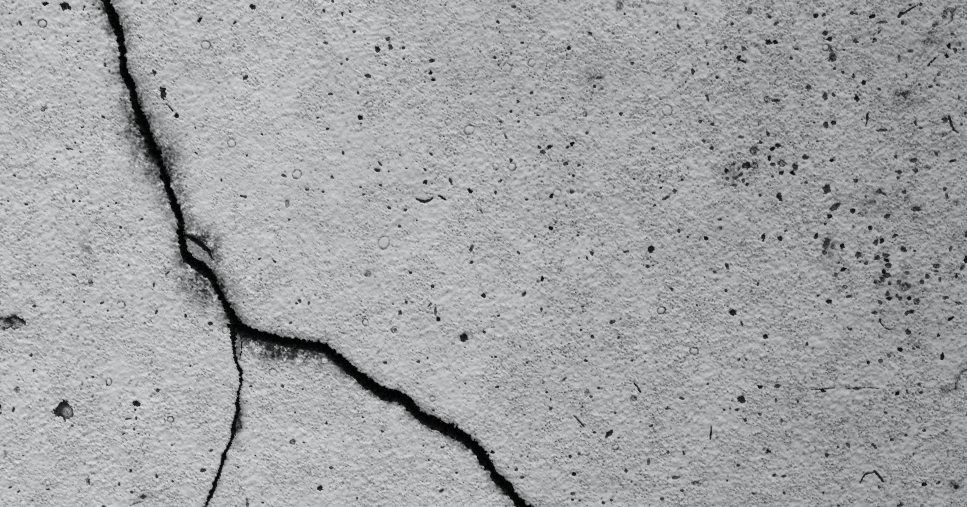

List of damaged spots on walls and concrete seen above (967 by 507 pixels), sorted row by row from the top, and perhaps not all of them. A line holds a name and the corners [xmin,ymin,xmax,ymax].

crack [101,0,534,507]